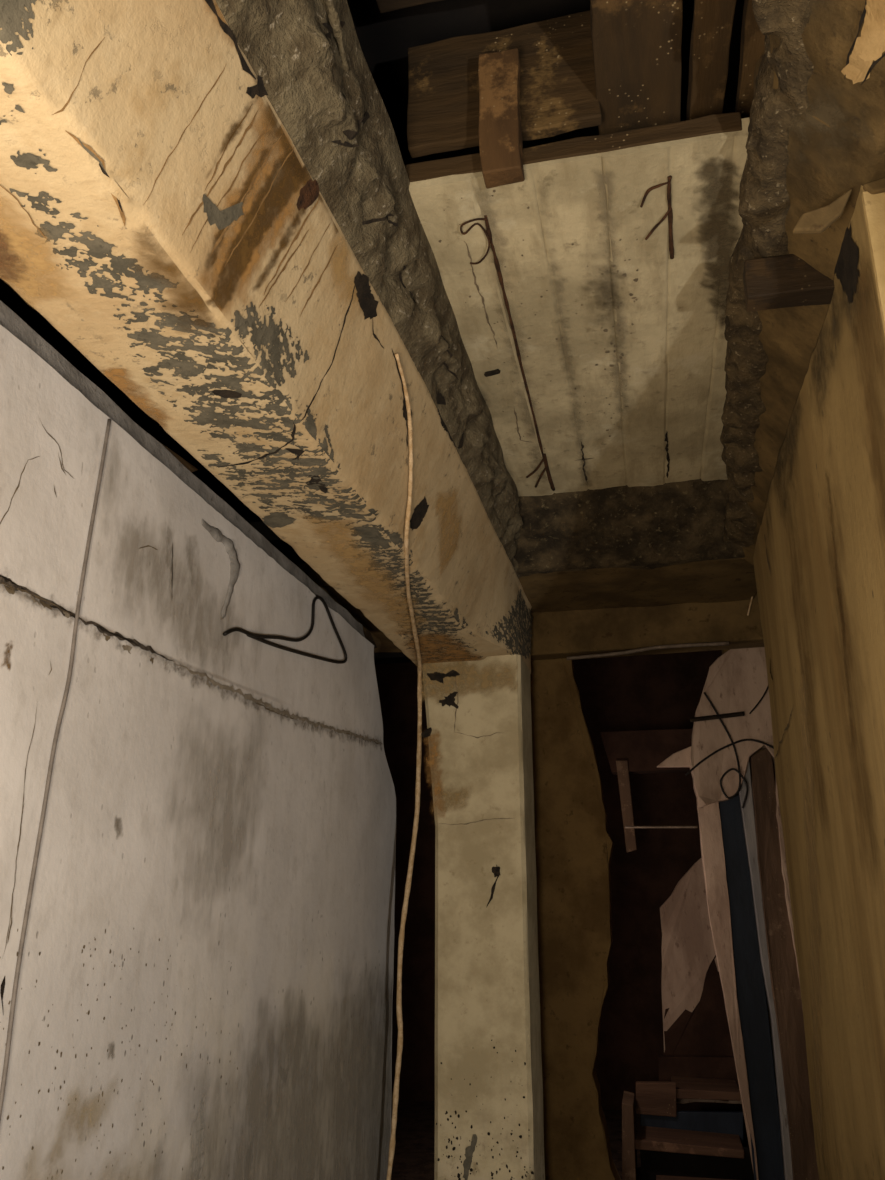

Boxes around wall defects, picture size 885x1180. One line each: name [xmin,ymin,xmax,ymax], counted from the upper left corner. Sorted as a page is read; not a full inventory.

peeling [0,0,37,56]
peeling [841,0,885,84]
peeling [0,82,25,125]
crack [52,0,256,226]
rust [267,104,313,185]
spalling [297,179,319,210]
crack [219,271,358,493]
crack [373,330,408,446]
crack [0,420,83,524]
peeling [9,188,533,709]
crack [0,575,382,750]
leakage [191,987,393,1180]